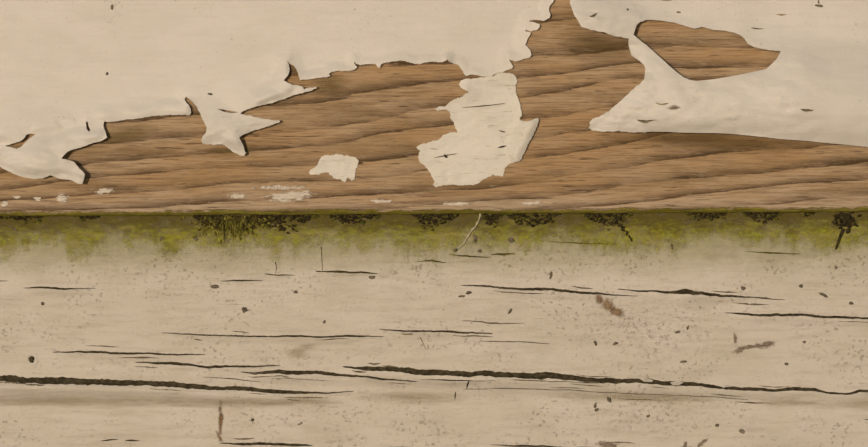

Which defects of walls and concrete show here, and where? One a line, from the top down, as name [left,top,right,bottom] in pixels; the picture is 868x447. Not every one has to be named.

peeling [0,0,554,187]
peeling [570,0,868,147]
crack [0,320,868,404]
crack [462,285,868,323]